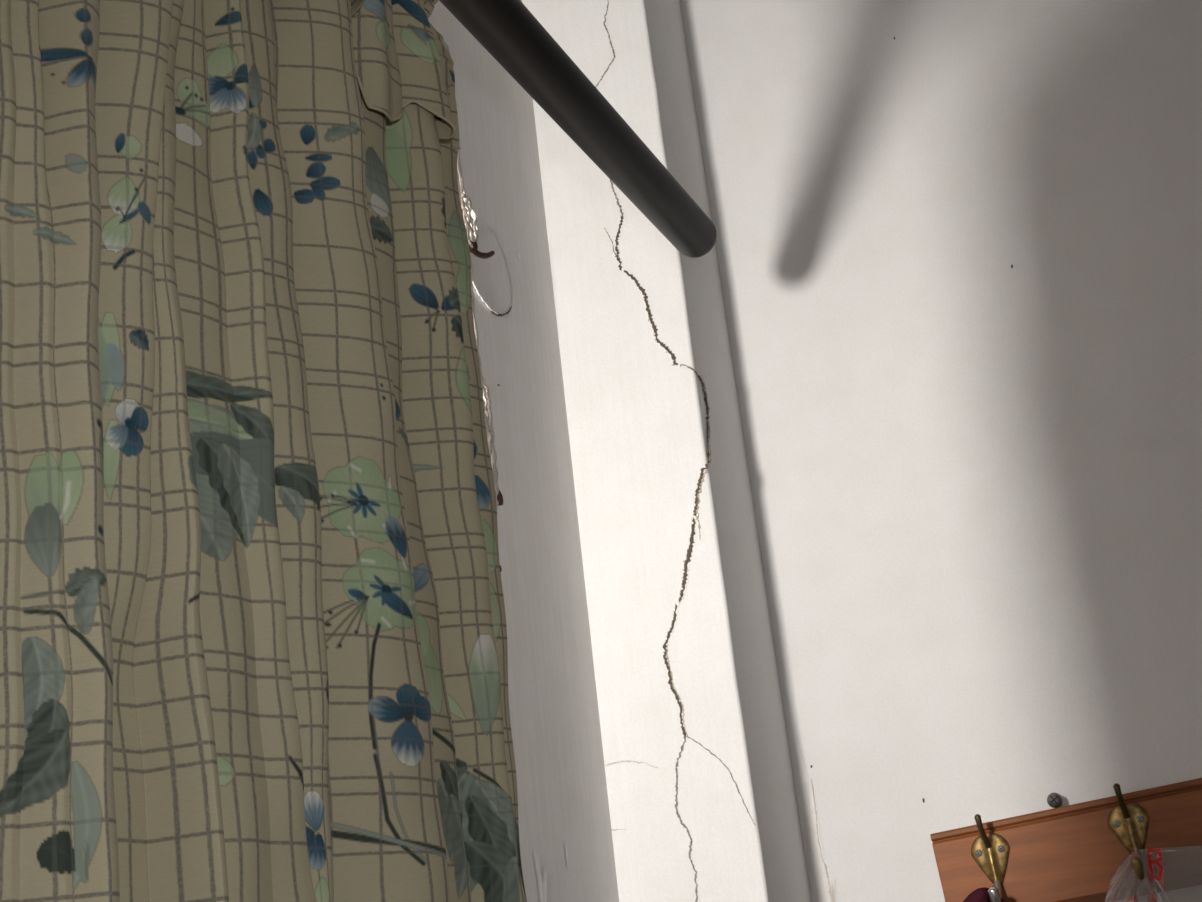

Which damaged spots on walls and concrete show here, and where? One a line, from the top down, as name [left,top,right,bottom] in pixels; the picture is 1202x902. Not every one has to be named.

crack [595,2,615,87]
crack [604,180,755,902]